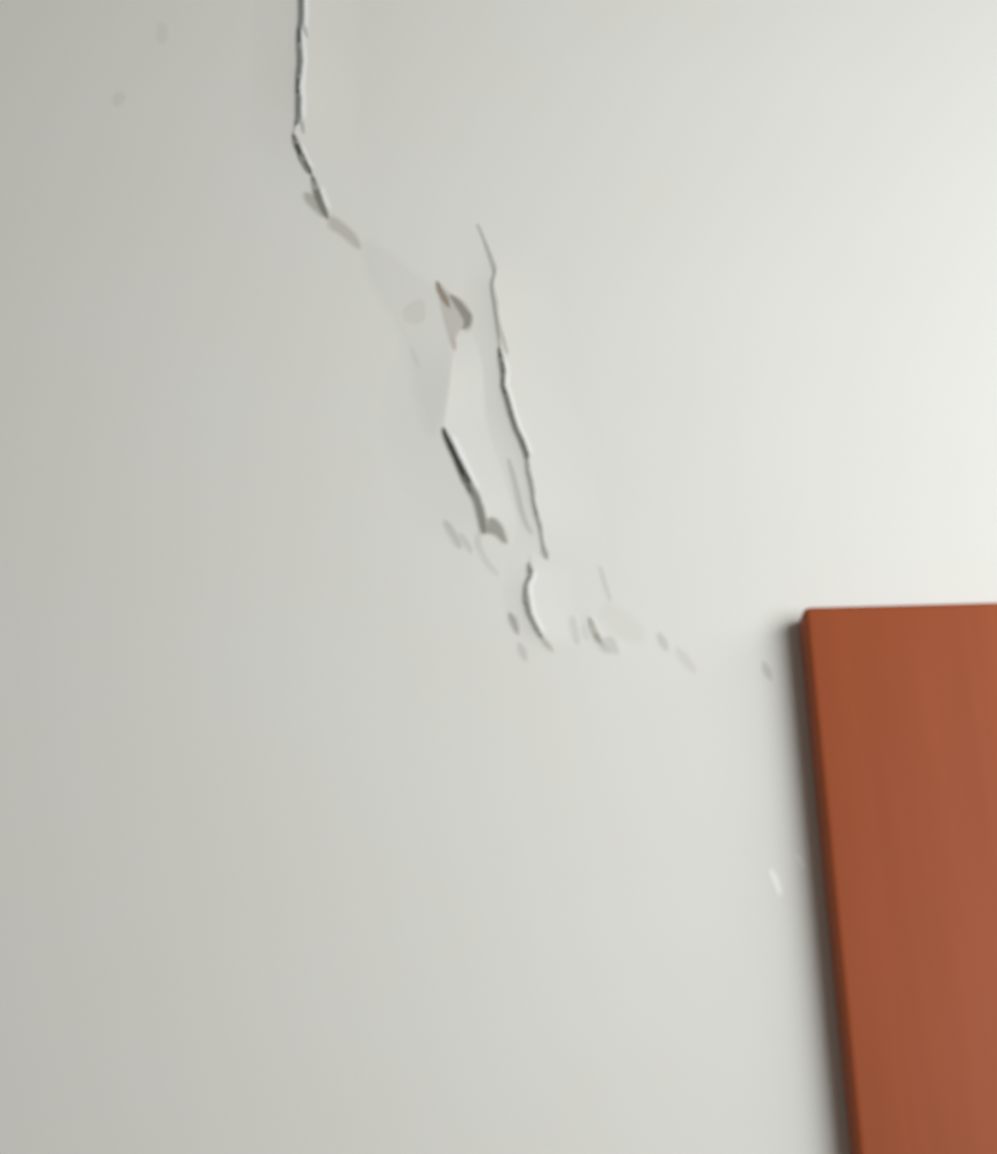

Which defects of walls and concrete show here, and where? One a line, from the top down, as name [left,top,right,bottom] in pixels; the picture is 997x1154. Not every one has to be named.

crack [291,0,331,219]
spalling [435,283,474,346]
spalling [478,516,509,545]
crack [435,224,554,652]